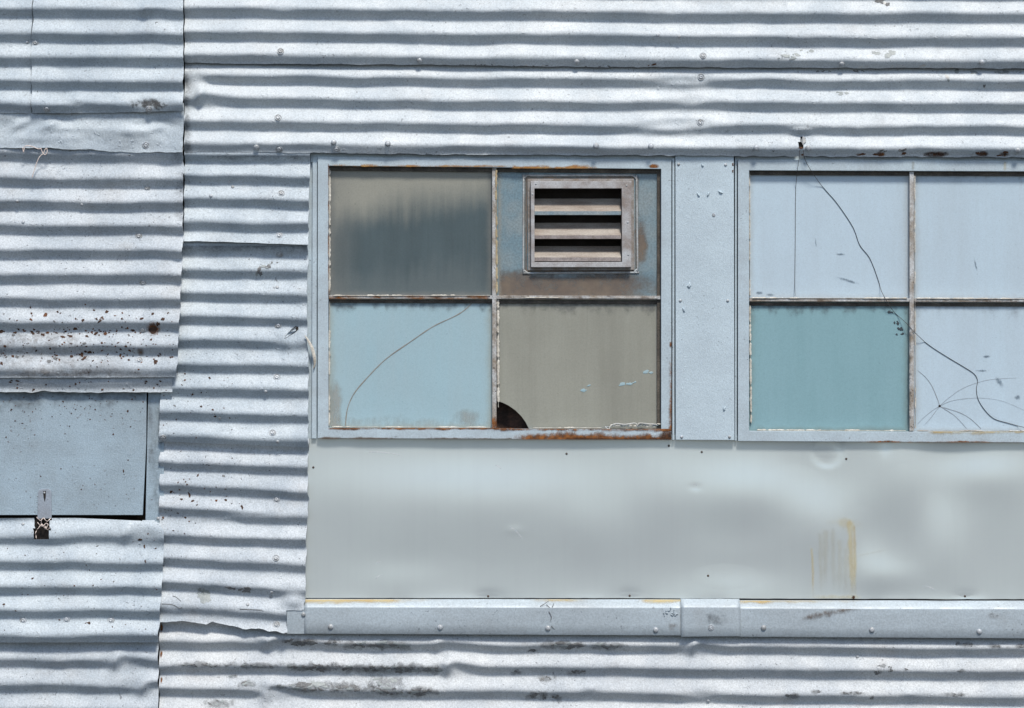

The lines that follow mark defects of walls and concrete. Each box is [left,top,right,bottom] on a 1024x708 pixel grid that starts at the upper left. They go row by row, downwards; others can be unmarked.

corrosion [0,304,177,435]
crack [345,303,472,426]
corrosion [330,398,671,440]
crack [920,372,1023,429]